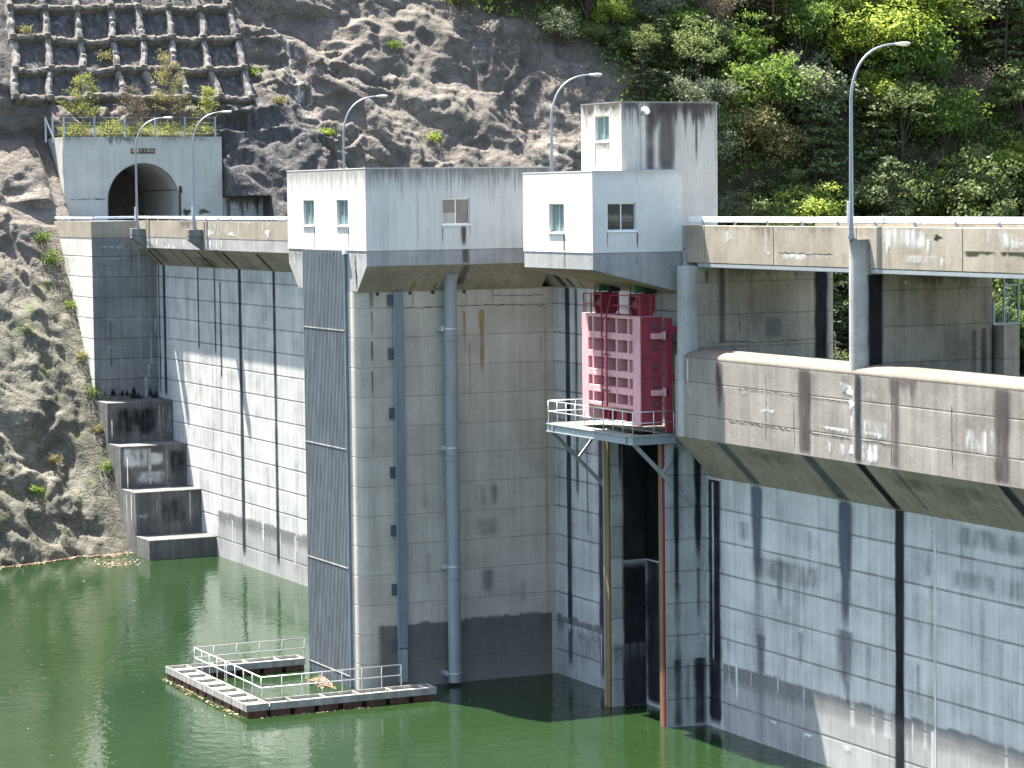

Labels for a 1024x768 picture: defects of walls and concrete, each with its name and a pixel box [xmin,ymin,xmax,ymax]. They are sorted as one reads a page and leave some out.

damp [583,103,713,169]
damp [99,229,307,561]
crack [404,290,546,309]
damp [553,275,577,422]
damp [461,435,605,675]
damp [694,369,1024,768]
damp [380,621,449,685]